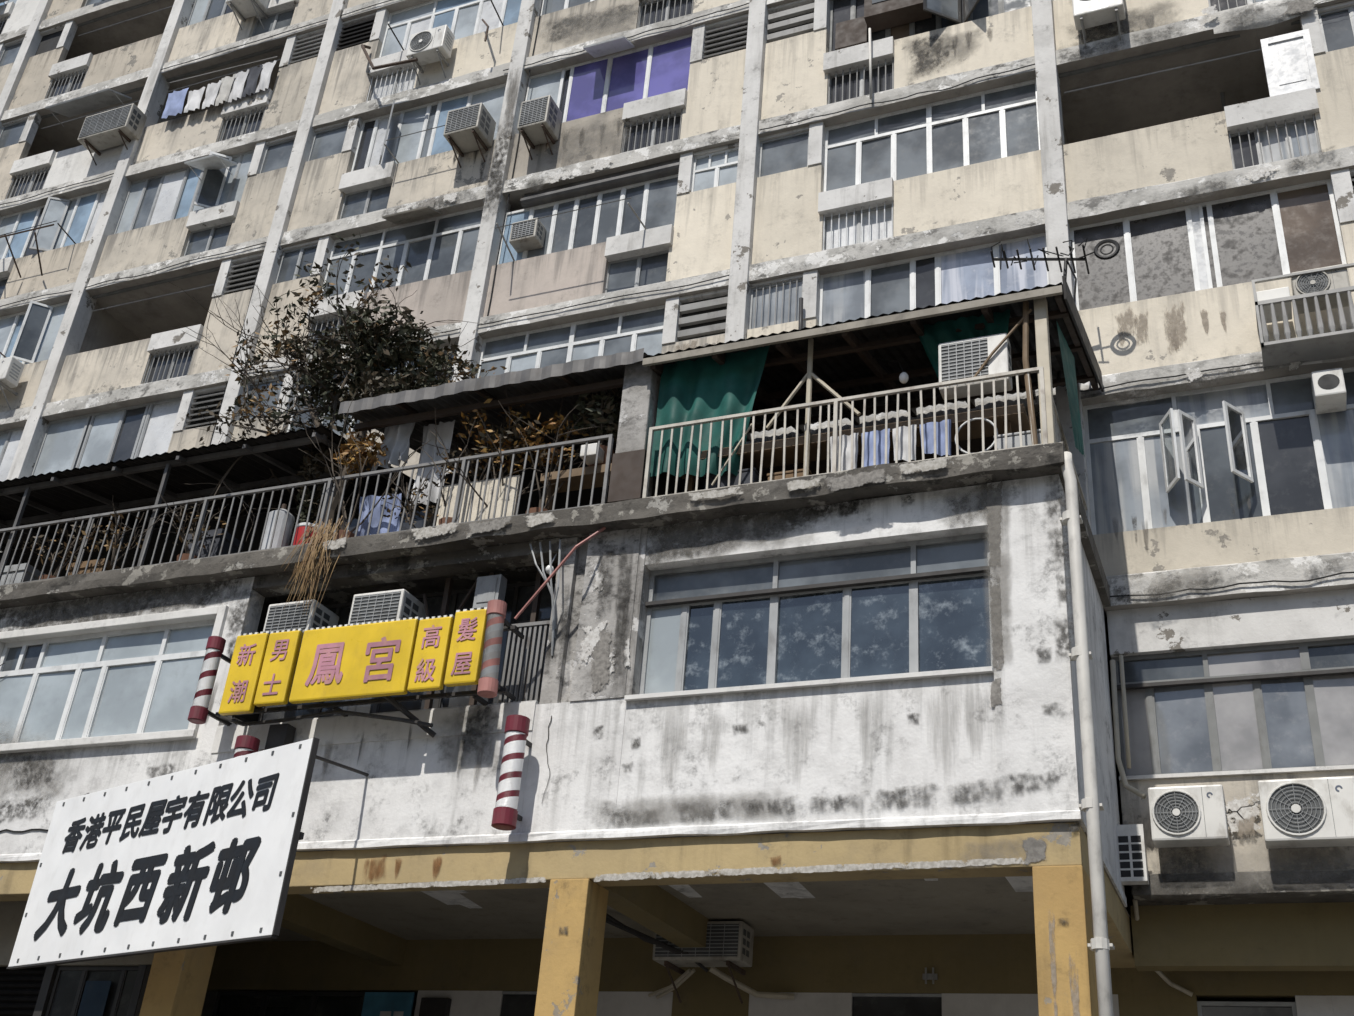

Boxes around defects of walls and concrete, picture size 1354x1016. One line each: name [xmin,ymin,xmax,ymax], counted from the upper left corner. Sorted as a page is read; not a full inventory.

damp [914,35,973,71]
damp [1049,477,1066,515]
damp [1055,531,1069,561]
damp [0,580,256,655]
damp [1038,618,1074,659]
damp [0,740,52,822]
damp [615,797,794,823]
damp [814,795,856,809]
damp [878,784,933,808]
damp [953,782,1000,802]
damp [1011,774,1053,792]